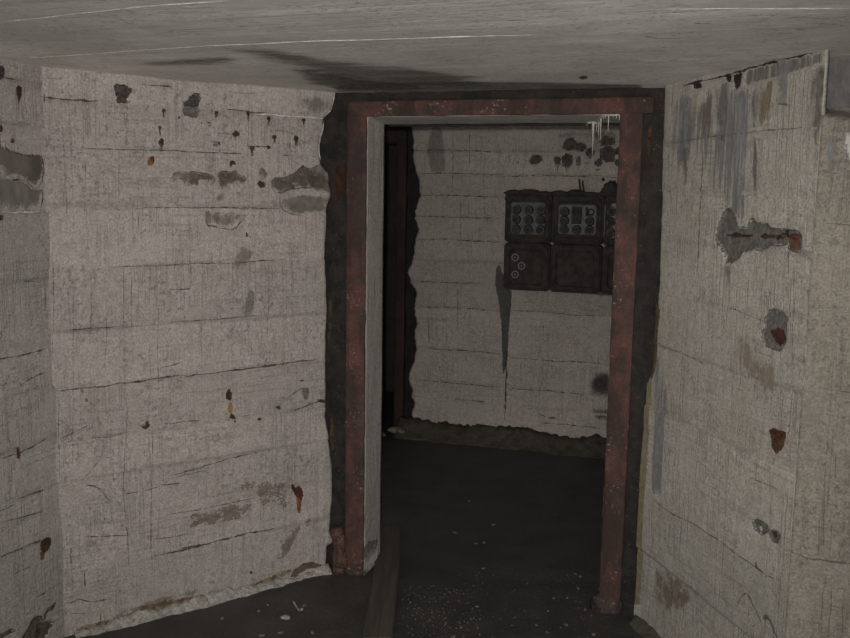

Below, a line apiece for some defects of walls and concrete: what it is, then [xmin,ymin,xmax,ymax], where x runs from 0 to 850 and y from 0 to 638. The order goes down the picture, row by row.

spalling [114,84,132,103]
leakage [254,51,642,92]
leakage [812,56,850,132]
rust [147,109,166,166]
leakage [673,59,791,222]
peeling [0,125,44,221]
peeling [257,164,330,216]
spalling [715,208,802,263]
spalling [761,302,788,352]
rust [769,428,786,467]
rust [291,484,304,513]
rust [40,537,51,560]